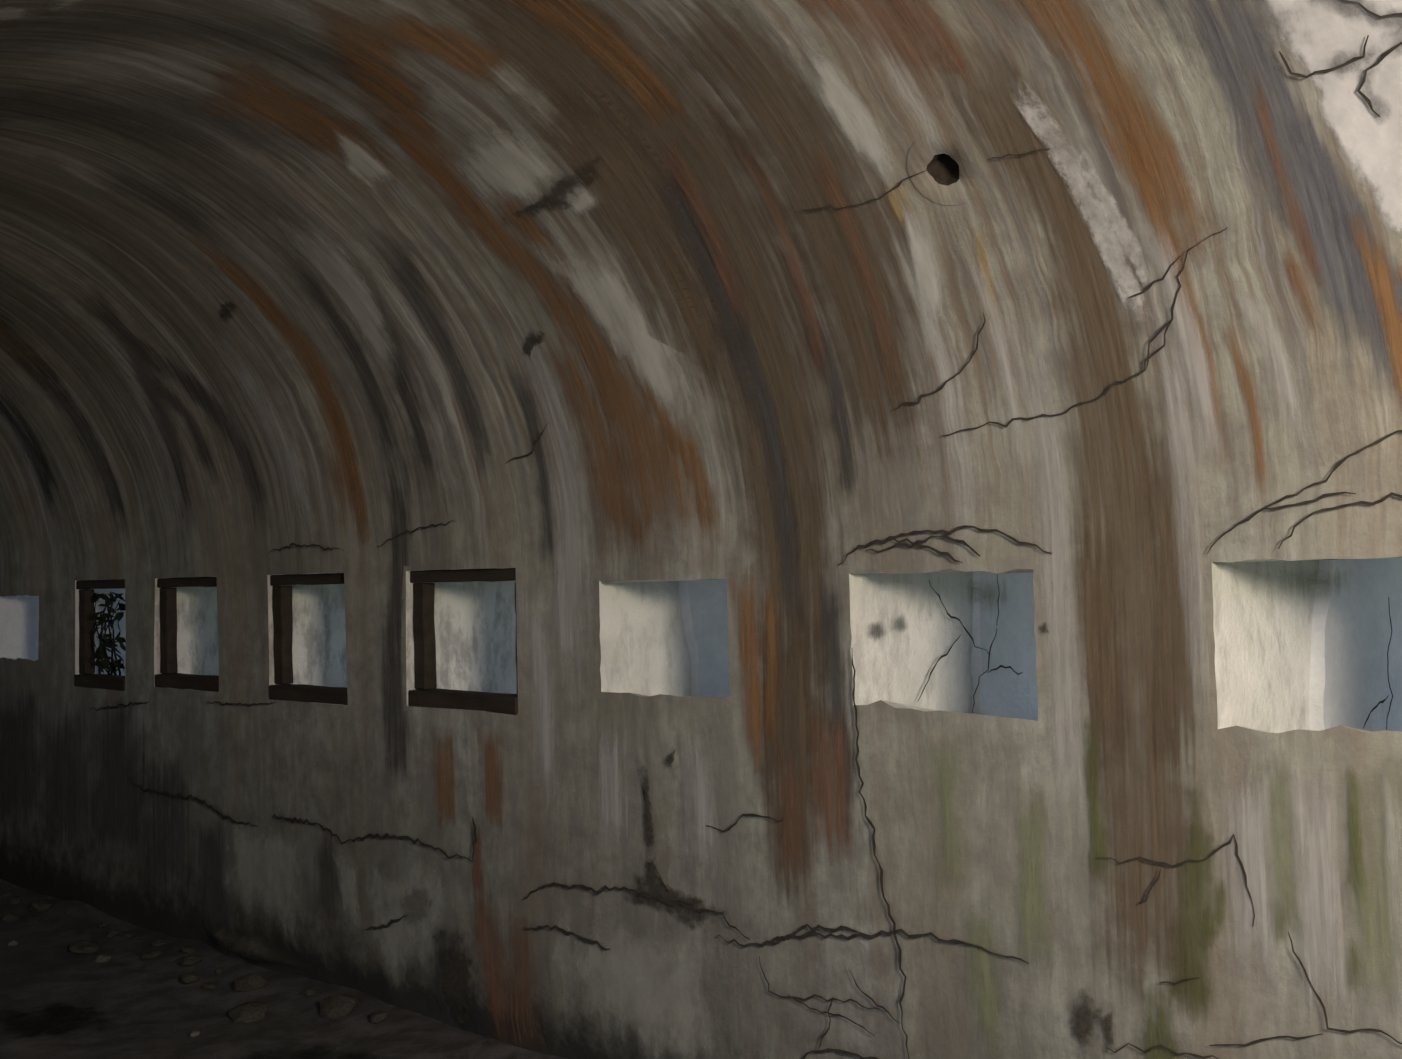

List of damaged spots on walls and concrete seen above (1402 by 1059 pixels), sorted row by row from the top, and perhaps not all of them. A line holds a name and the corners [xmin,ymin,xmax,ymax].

corrosion [1023,0,1219,426]
peeling [1266,0,1402,231]
crack [1279,0,1402,117]
crack [941,227,1228,436]
damp [968,67,1227,1004]
corrosion [1233,341,1264,481]
crack [1207,430,1402,554]
corrosion [740,590,777,763]
crack [524,648,1029,1059]
damp [1232,794,1282,947]
damp [1294,790,1337,995]
damp [1349,779,1392,946]